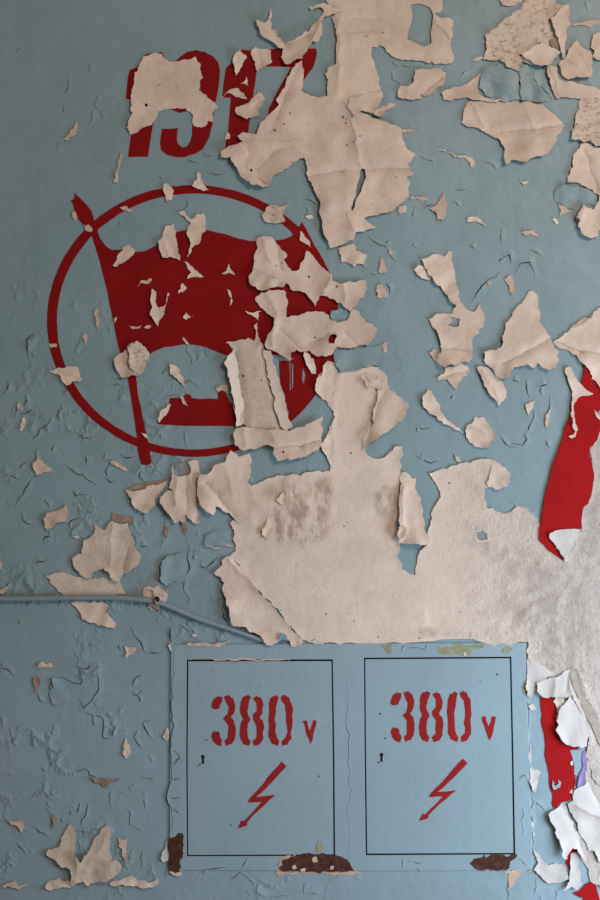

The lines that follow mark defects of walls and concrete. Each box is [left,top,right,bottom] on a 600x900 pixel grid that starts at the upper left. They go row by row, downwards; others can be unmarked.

peeling [127,0,600,266]
peeling [130,211,206,329]
flaking render [71,231,600,892]
crack [16,538,290,868]
peeling [1,824,128,890]
corrosion [168,833,184,877]
corrosion [276,841,360,877]
corrosion [470,853,532,888]